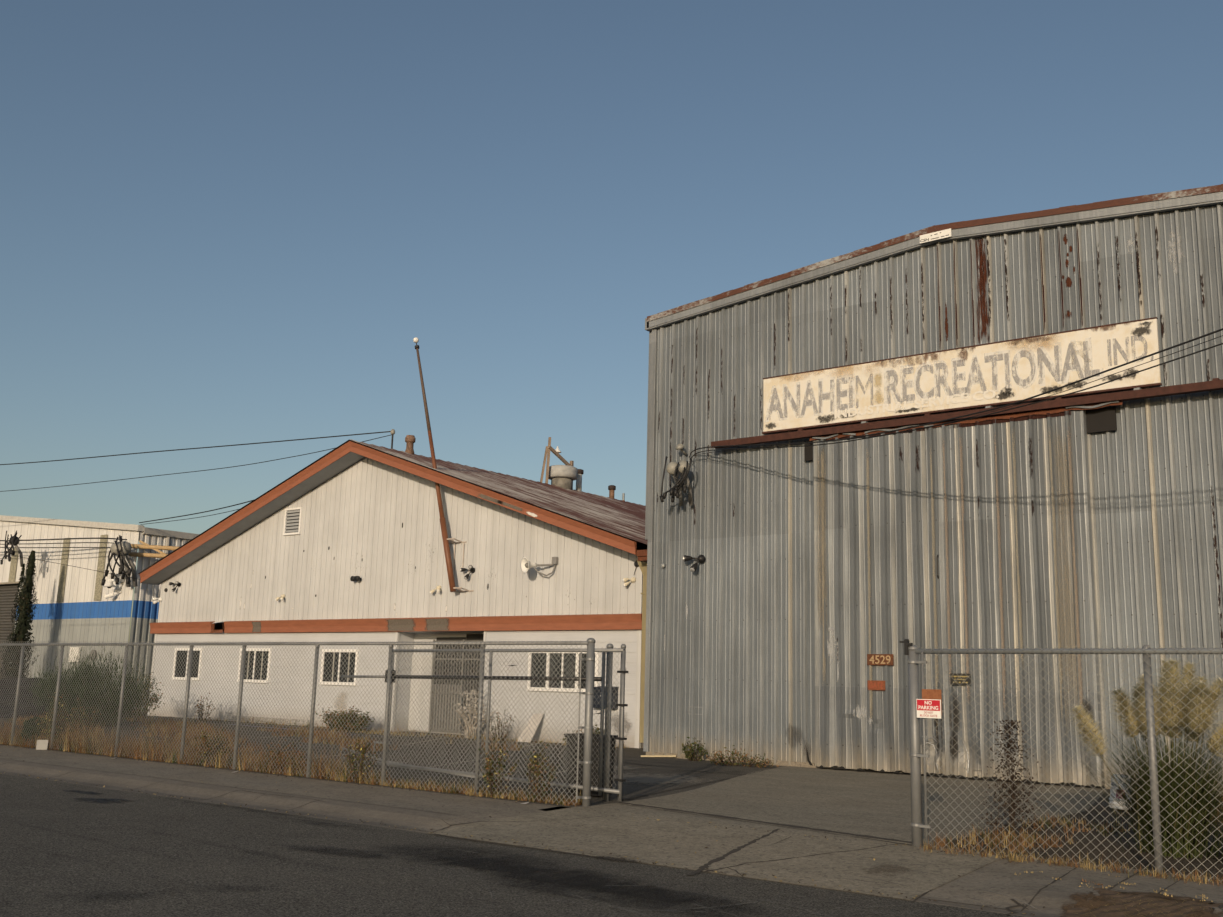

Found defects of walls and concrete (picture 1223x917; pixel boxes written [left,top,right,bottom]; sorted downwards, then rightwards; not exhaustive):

rust [881,238,989,364]
peeling [1042,381,1085,394]
peeling [1103,369,1138,381]
crack [686,829,895,880]